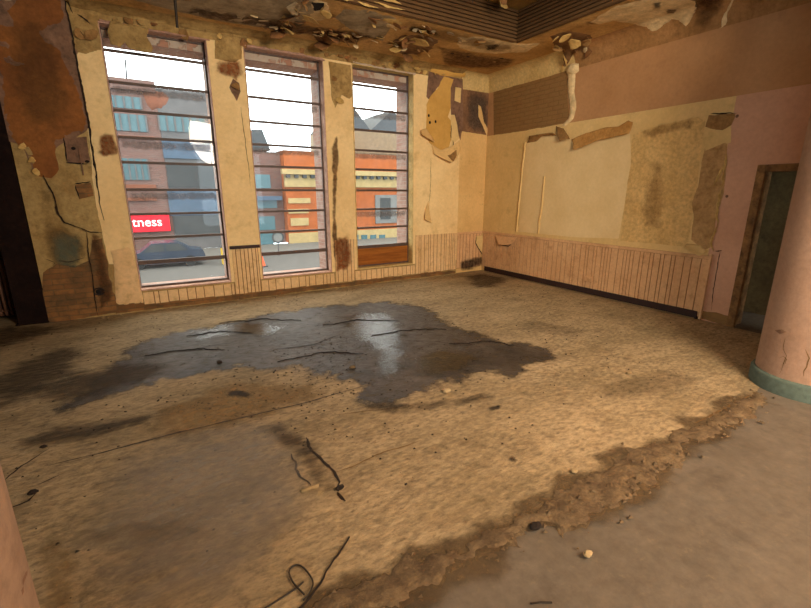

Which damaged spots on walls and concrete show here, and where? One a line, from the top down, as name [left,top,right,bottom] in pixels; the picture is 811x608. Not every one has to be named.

flaking render [135,0,592,150]
spalling [591,0,696,31]
crack [43,1,104,315]
peeling [0,0,455,323]
damp [332,138,350,270]
flaking render [620,112,739,251]
damp [56,301,555,413]
crack [781,340,810,376]
spalling [314,391,768,608]